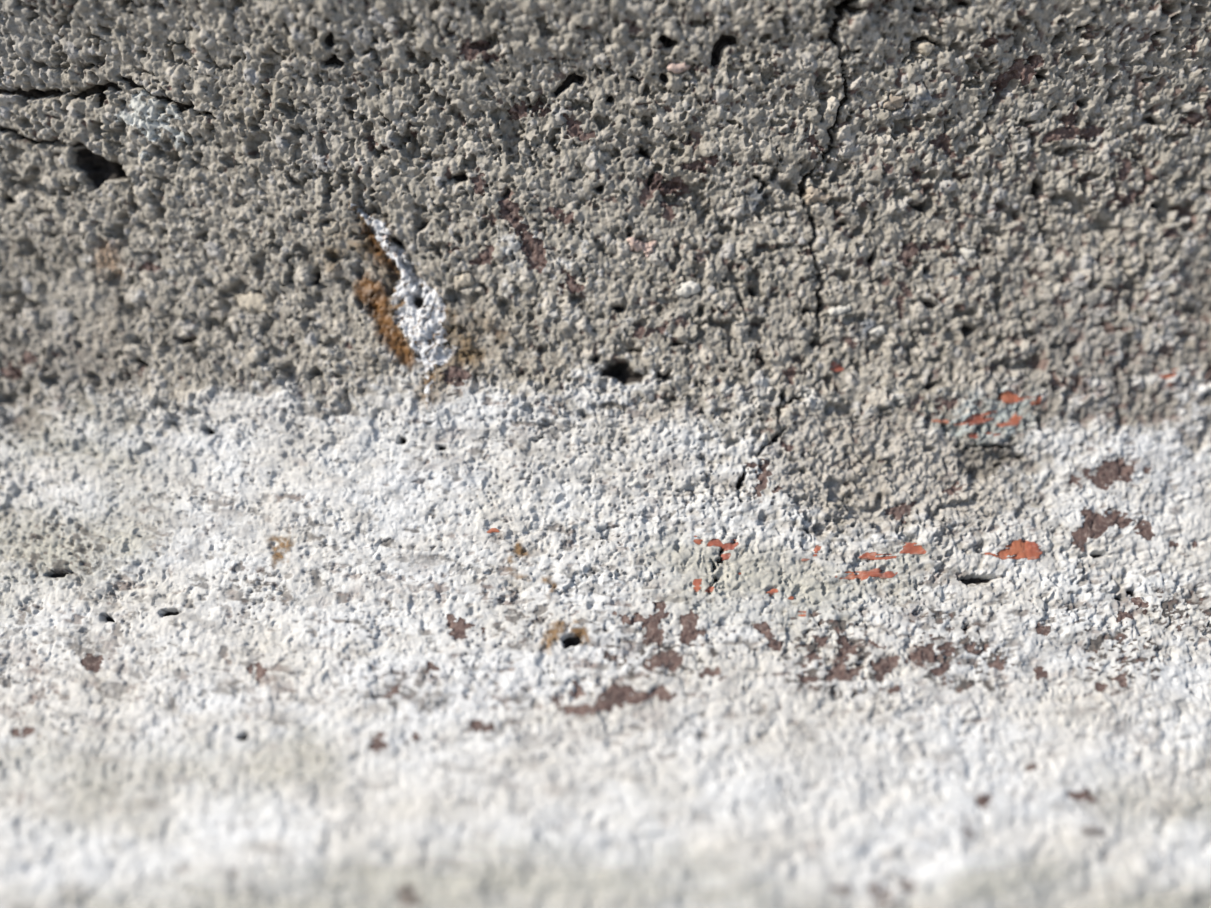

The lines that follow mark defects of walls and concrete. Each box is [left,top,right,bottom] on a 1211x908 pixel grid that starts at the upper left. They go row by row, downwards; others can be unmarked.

crack [0,77,212,115]
crack [0,128,85,147]
crack [798,0,863,335]
corrosion [350,206,480,384]
crack [736,393,804,490]
peeling [1069,457,1152,490]
peeling [1071,507,1198,558]
peeling [835,542,926,580]
peeling [446,614,485,640]
peeling [550,601,701,717]
peeling [797,626,1006,694]
peeling [1095,673,1127,693]